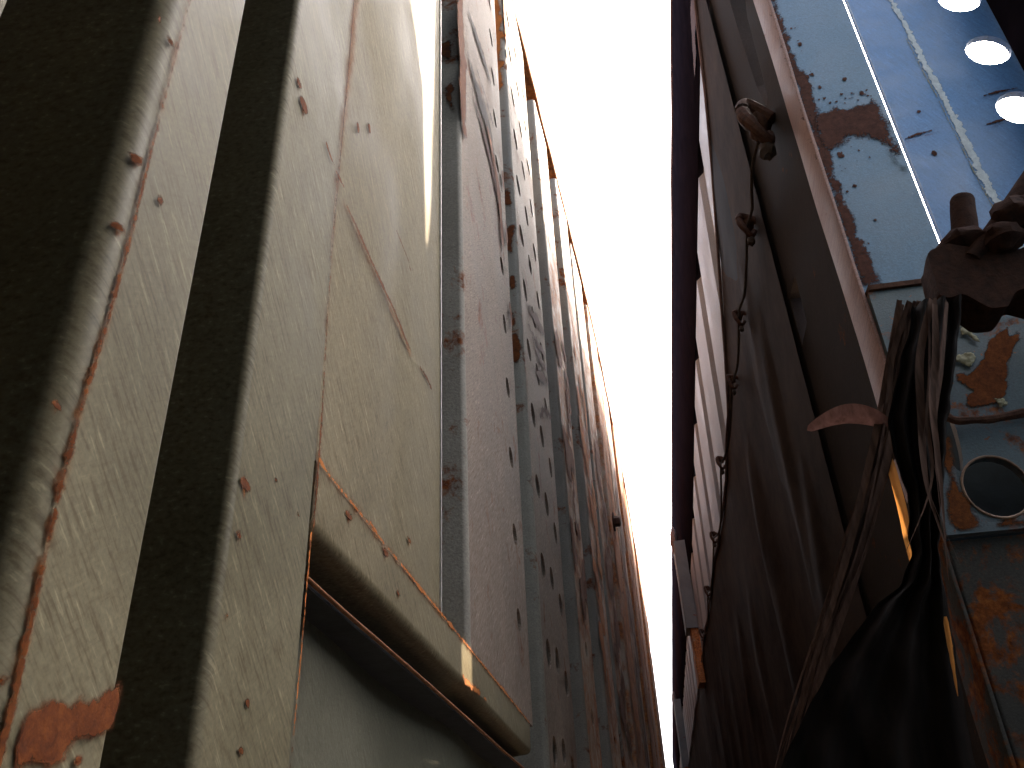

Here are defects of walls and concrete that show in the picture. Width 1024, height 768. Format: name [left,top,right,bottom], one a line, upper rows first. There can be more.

corrosion [297,77,308,114]
corrosion [441,0,467,138]
corrosion [771,0,902,286]
corrosion [0,83,169,768]
corrosion [292,245,530,748]
corrosion [944,436,979,530]